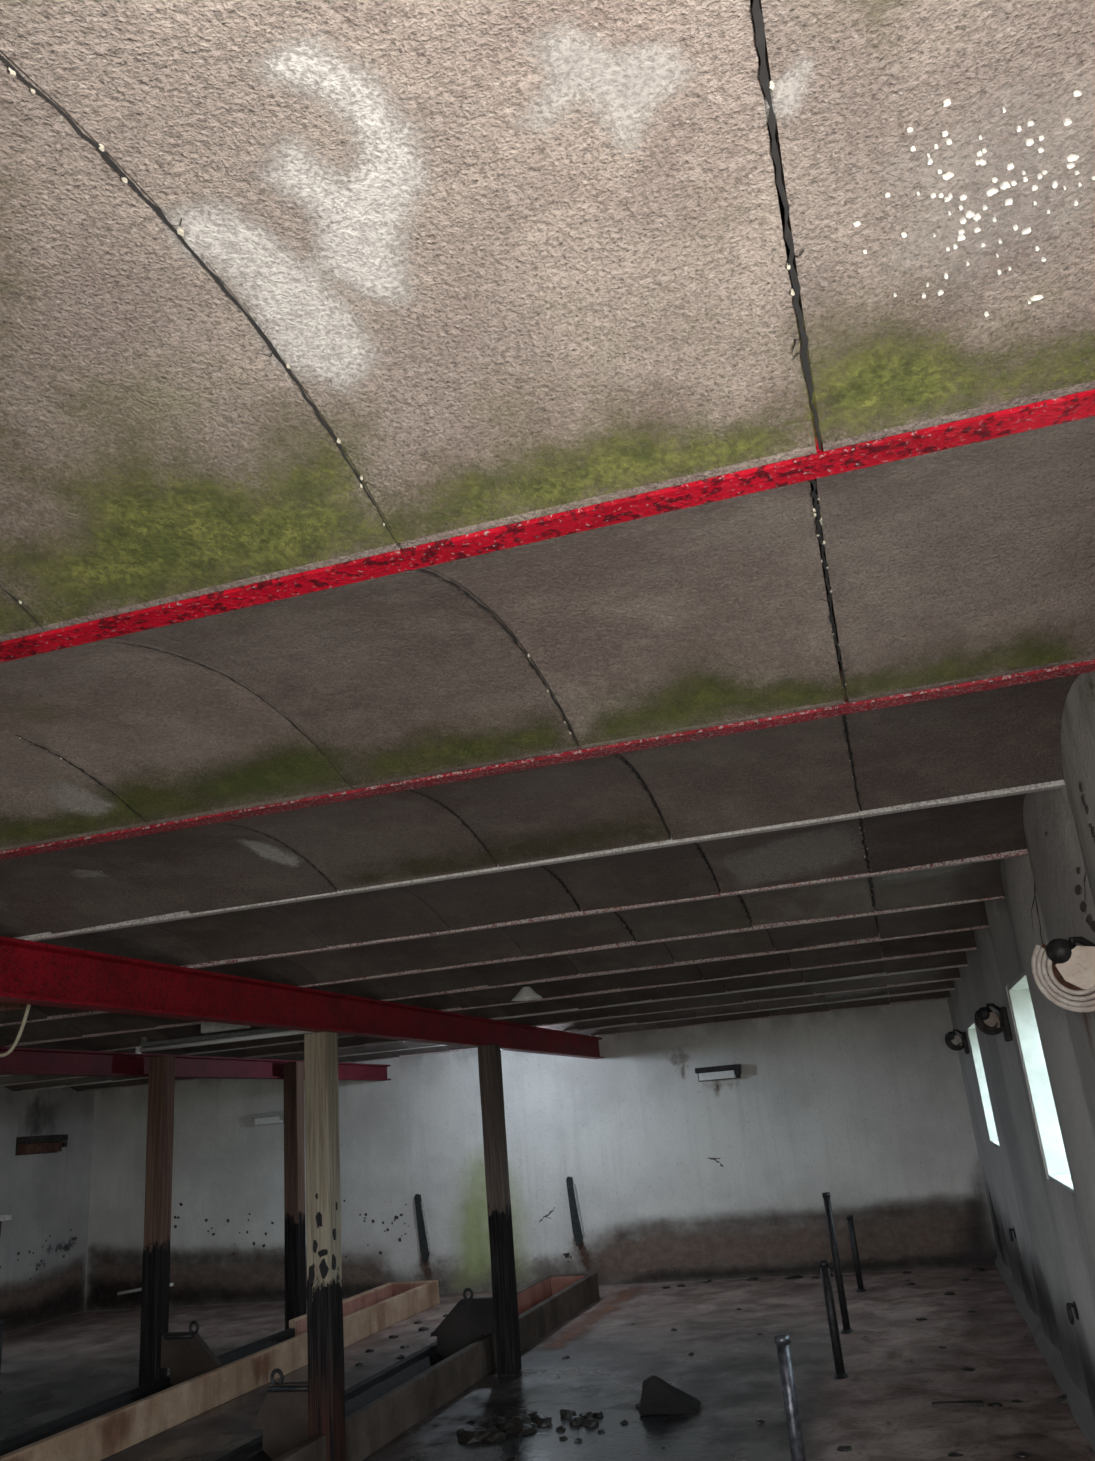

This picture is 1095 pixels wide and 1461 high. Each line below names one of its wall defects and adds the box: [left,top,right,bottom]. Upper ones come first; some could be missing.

damp [171,42,422,388]
crack [0,54,579,749]
crack [752,0,877,911]
crack [106,641,352,789]
damp [52,783,110,812]
crack [15,734,148,824]
damp [238,839,300,866]
crack [222,823,336,890]
crack [406,790,497,866]
crack [541,866,636,942]
crack [614,754,753,927]
damp [515,1201,1048,1314]